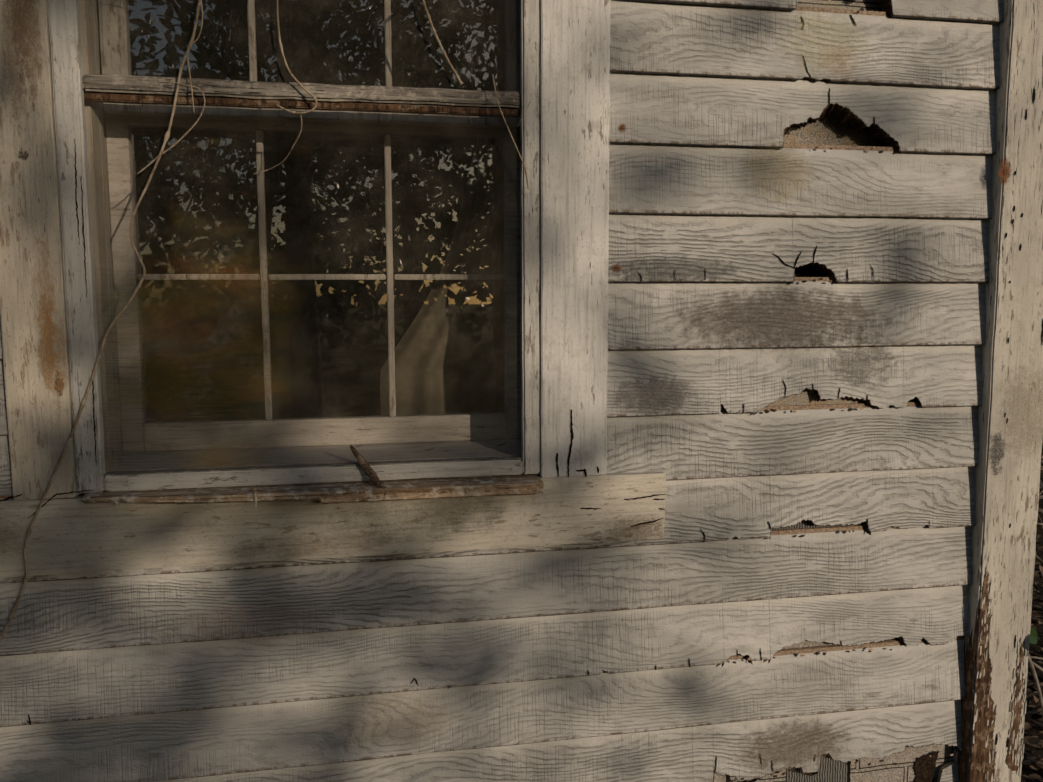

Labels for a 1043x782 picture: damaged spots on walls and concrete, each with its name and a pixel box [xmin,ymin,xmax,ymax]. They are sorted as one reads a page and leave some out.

crack [556,410,599,478]
peeling [950,567,1029,782]